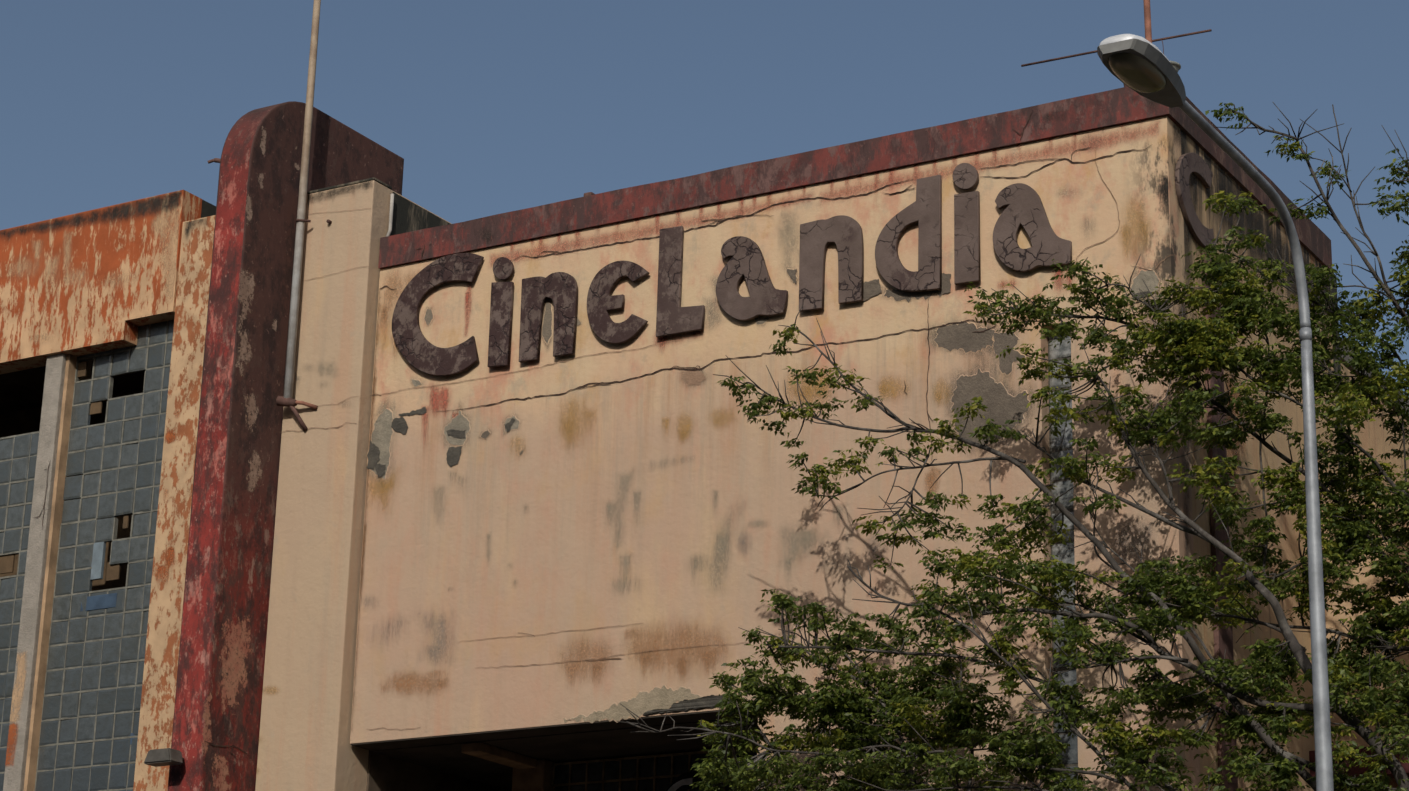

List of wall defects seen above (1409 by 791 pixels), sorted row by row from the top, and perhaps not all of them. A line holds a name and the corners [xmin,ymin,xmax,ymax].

crack [511,179,914,261]
crack [980,112,1151,262]
peeling [235,268,257,376]
peeling [241,393,264,493]
peeling [367,405,427,480]
peeling [443,410,520,467]
crack [284,304,1027,452]
peeling [932,320,1032,450]
peeling [201,614,253,791]
spalling [563,684,731,723]